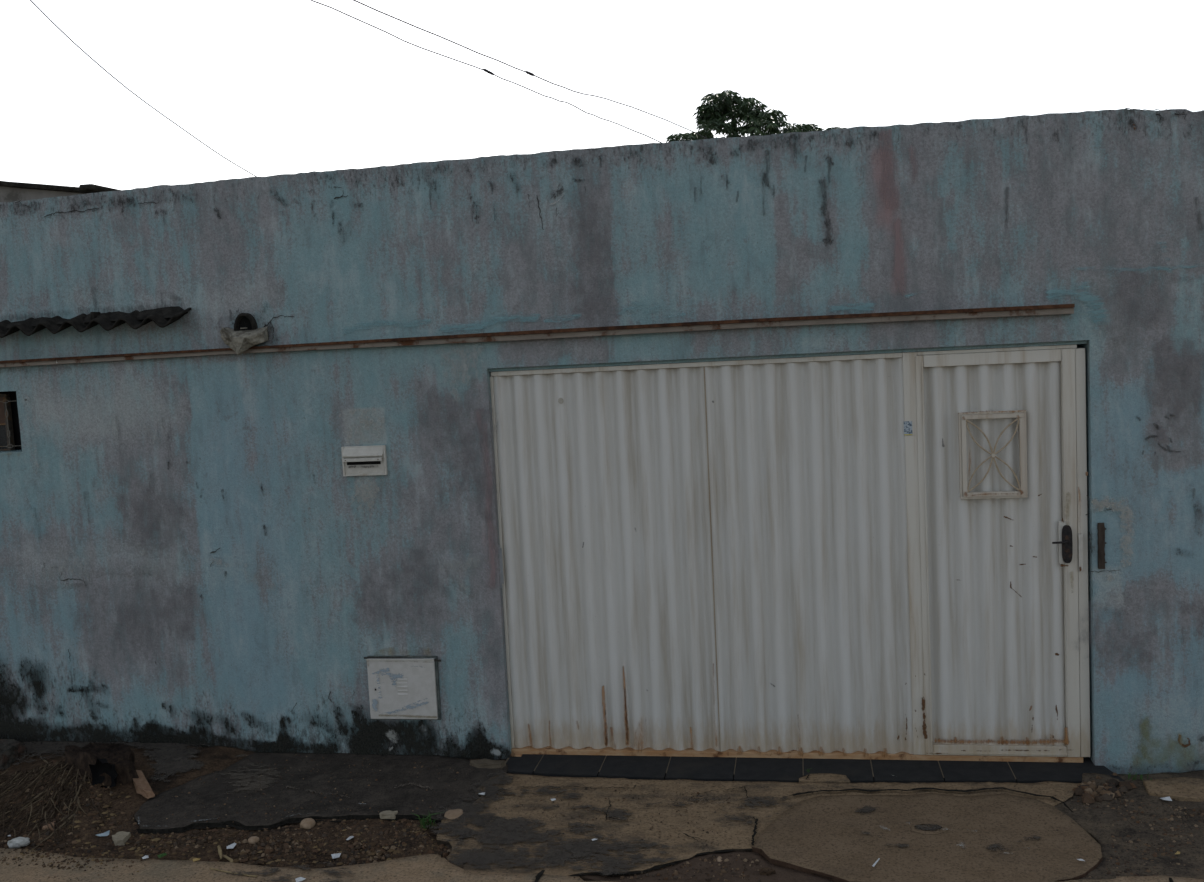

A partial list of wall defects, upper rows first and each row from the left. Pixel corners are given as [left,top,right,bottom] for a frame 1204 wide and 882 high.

water stain [0,661,515,798]
corrosion [602,666,643,749]
corrosion [897,697,1069,754]
crack [529,786,758,882]
crack [785,774,1073,812]